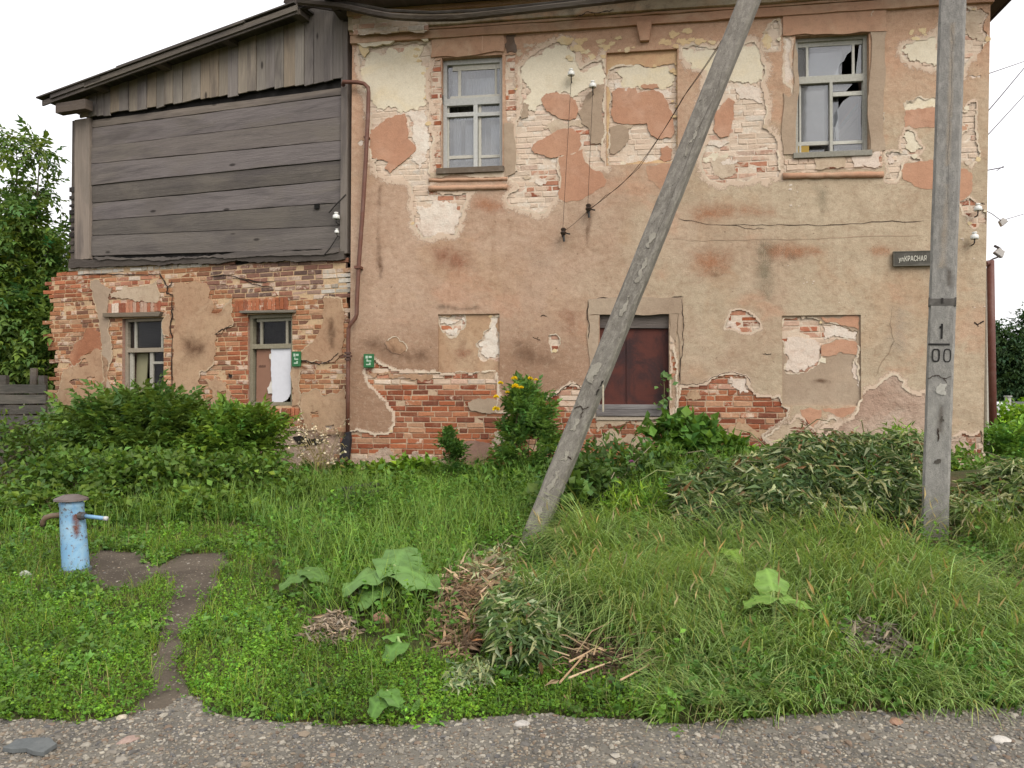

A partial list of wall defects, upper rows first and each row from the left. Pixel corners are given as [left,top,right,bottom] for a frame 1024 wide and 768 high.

flaking render [352,15,926,245]
crack [650,73,924,253]
flaking render [896,23,938,74]
flaking render [903,96,935,110]
flaking render [961,99,981,169]
flaking render [963,6,991,80]
crack [80,273,173,386]
flaking render [275,314,528,475]
flaking render [518,362,662,517]
flaking render [723,308,763,336]
flaking render [670,315,947,448]